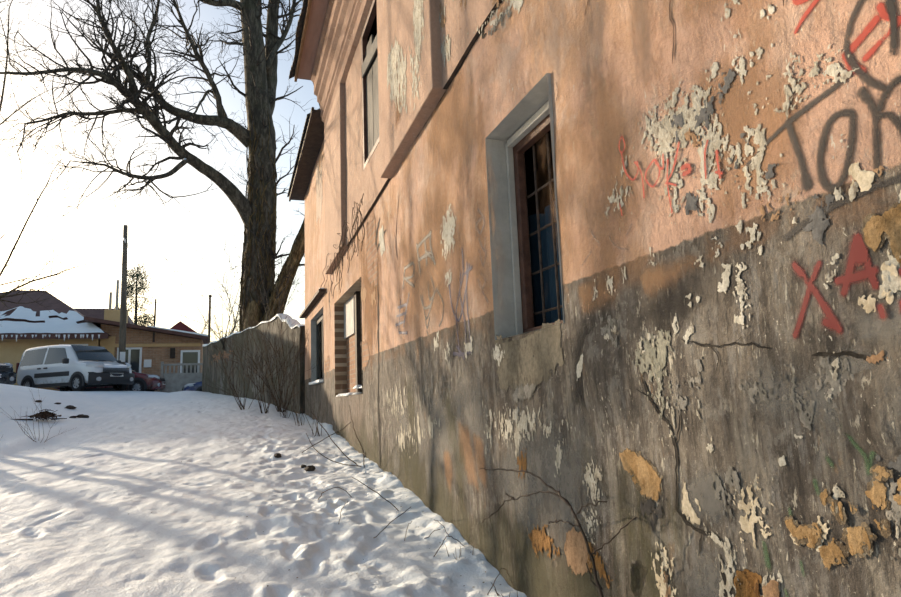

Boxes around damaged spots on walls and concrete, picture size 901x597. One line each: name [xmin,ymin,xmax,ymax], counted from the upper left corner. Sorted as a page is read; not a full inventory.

crack [667,0,675,64]
peeling [604,29,884,255]
flaking render [858,190,901,314]
water stain [574,330,588,404]
crack [681,338,769,366]
crack [811,344,868,361]
water stain [394,366,491,508]
water stain [502,431,599,537]
water stain [645,551,660,597]
crack [636,377,727,597]
flaking render [682,461,783,597]
flaking render [785,454,901,571]